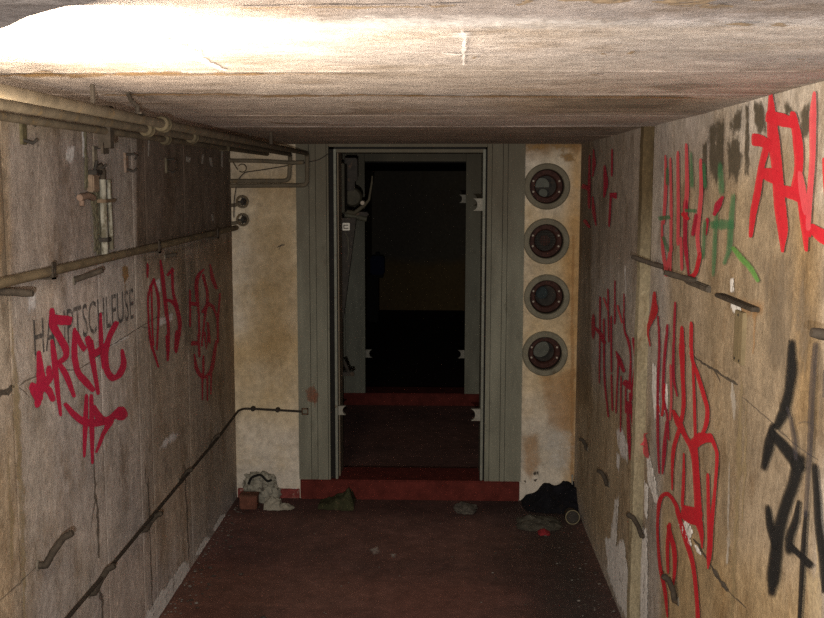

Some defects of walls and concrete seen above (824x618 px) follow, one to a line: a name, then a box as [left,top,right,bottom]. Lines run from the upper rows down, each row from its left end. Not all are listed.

crack [0,317,157,398]